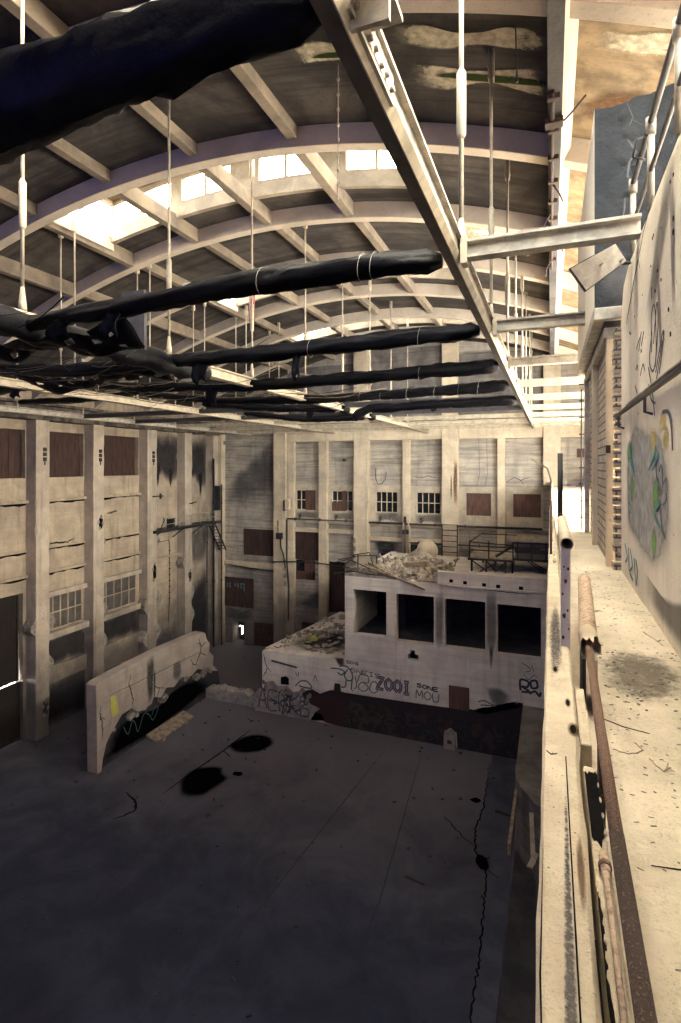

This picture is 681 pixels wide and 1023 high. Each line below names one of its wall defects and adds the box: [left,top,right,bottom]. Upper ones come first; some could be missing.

efflorescence [405,25,541,50]
efflorescence [424,66,544,94]
water stain [156,437,177,485]
water stain [192,441,206,495]
crack [100,640,207,737]
crack [113,792,137,820]
crack [444,763,500,1023]
corrosion [598,850,628,1023]